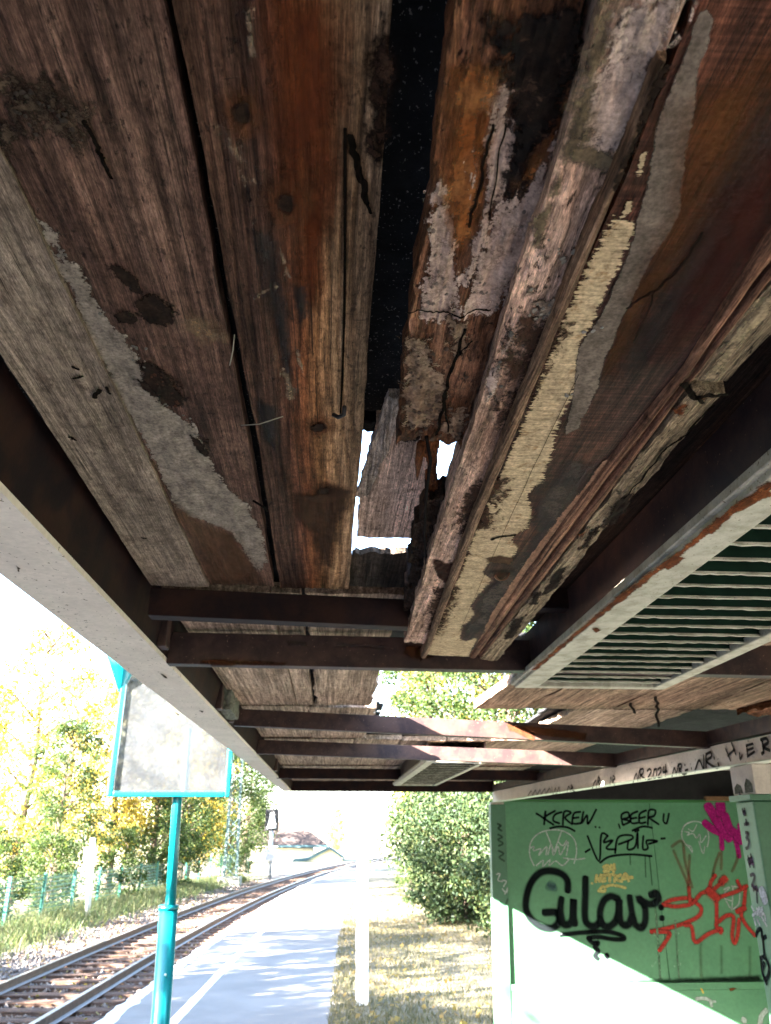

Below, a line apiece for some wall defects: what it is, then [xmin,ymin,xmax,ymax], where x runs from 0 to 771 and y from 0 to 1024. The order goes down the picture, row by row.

water stain [443,65,498,249]
crack [468,123,507,228]
crack [406,309,576,436]
water stain [530,174,563,249]
water stain [522,0,621,186]
crack [626,232,704,343]
crack [423,375,579,636]
corrosion [531,481,771,670]